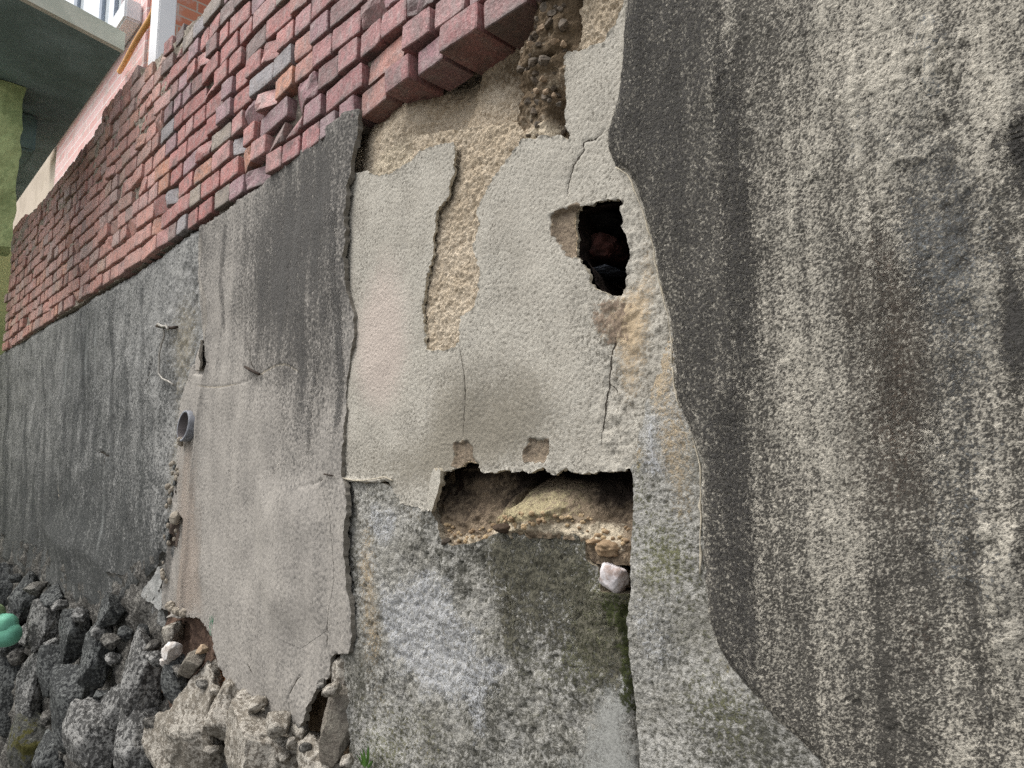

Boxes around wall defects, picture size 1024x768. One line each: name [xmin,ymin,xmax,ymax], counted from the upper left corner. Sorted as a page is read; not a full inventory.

spalling [354,0,624,351]
crack [567,134,601,196]
water stain [982,104,1024,191]
crack [596,305,618,444]
water stain [608,0,775,709]
water stain [841,119,1024,523]
peeling [428,440,475,512]
spalling [141,566,217,683]